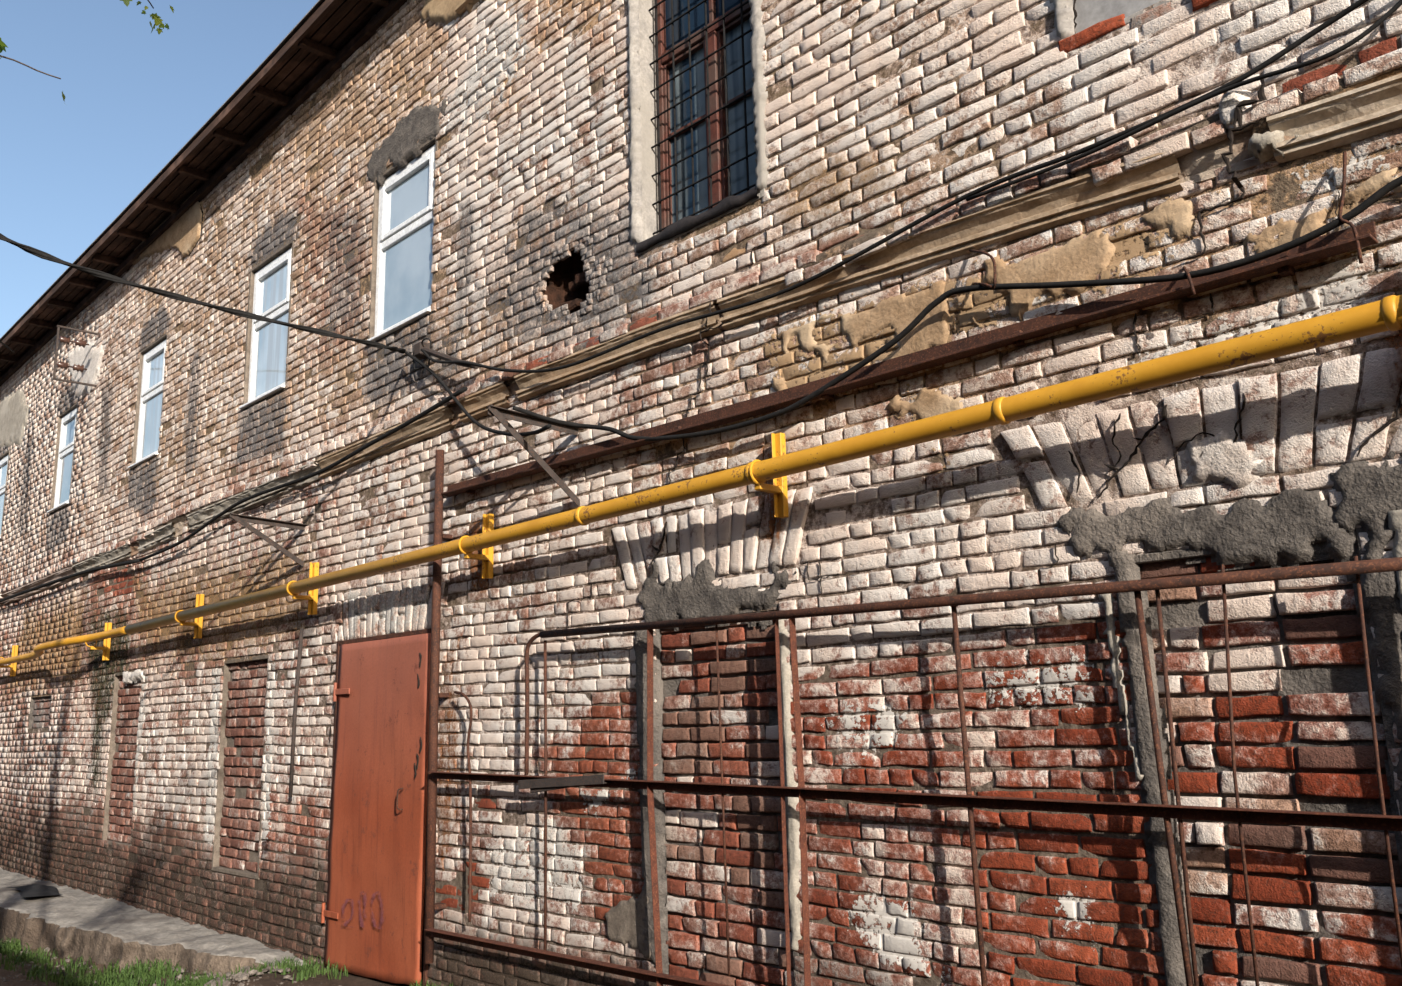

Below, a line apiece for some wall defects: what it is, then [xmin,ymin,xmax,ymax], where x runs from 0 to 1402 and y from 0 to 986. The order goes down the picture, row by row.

crack [1179,85,1267,262]
spalling [543,249,590,314]
crack [1193,293,1214,320]
crack [1068,393,1246,499]
crack [1357,398,1402,457]
peeling [436,692,658,920]
peeling [804,620,1166,986]
damp [0,815,324,961]